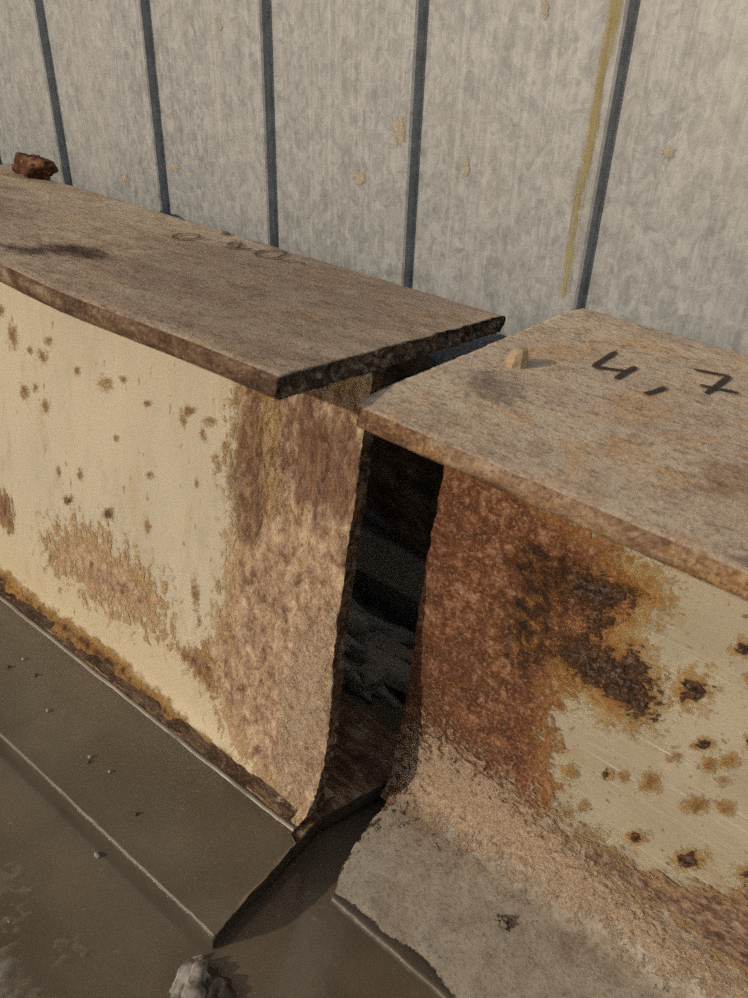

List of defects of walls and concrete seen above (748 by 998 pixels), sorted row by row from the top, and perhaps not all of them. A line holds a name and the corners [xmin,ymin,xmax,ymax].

rust [8,325,51,364]
rust [0,242,110,259]
water stain [561,0,622,295]
rust [0,376,372,824]
rust [380,466,748,998]